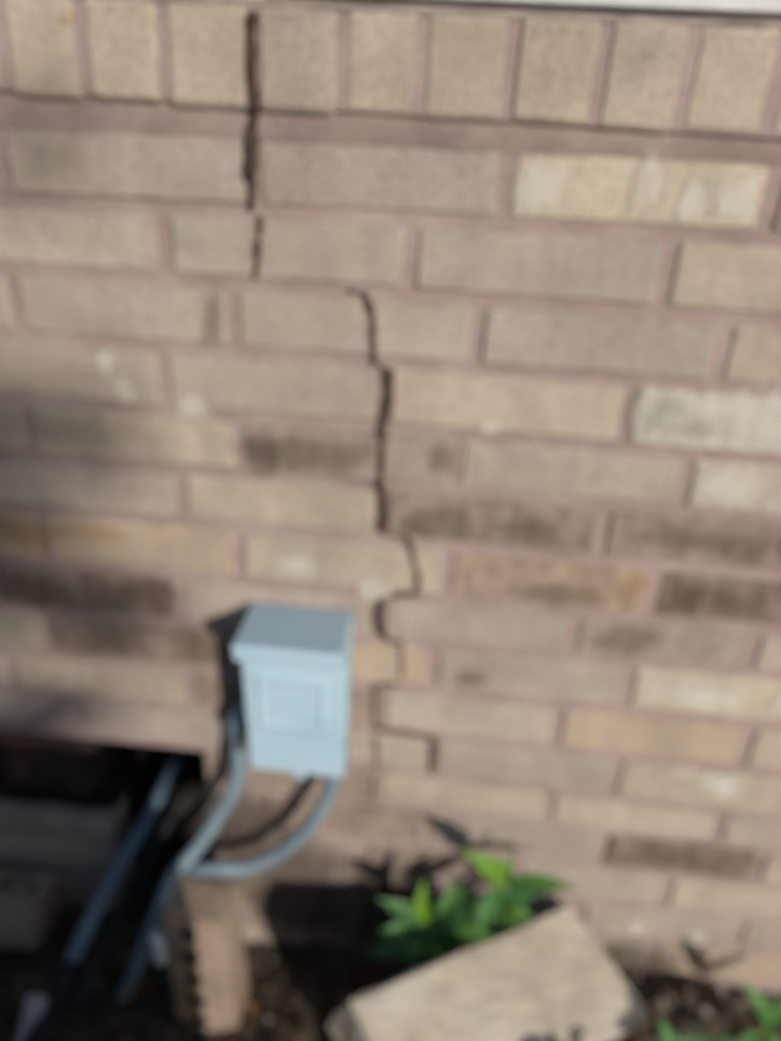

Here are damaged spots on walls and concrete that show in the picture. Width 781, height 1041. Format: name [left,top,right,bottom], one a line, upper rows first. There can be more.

crack [245,11,263,280]
crack [347,290,436,805]